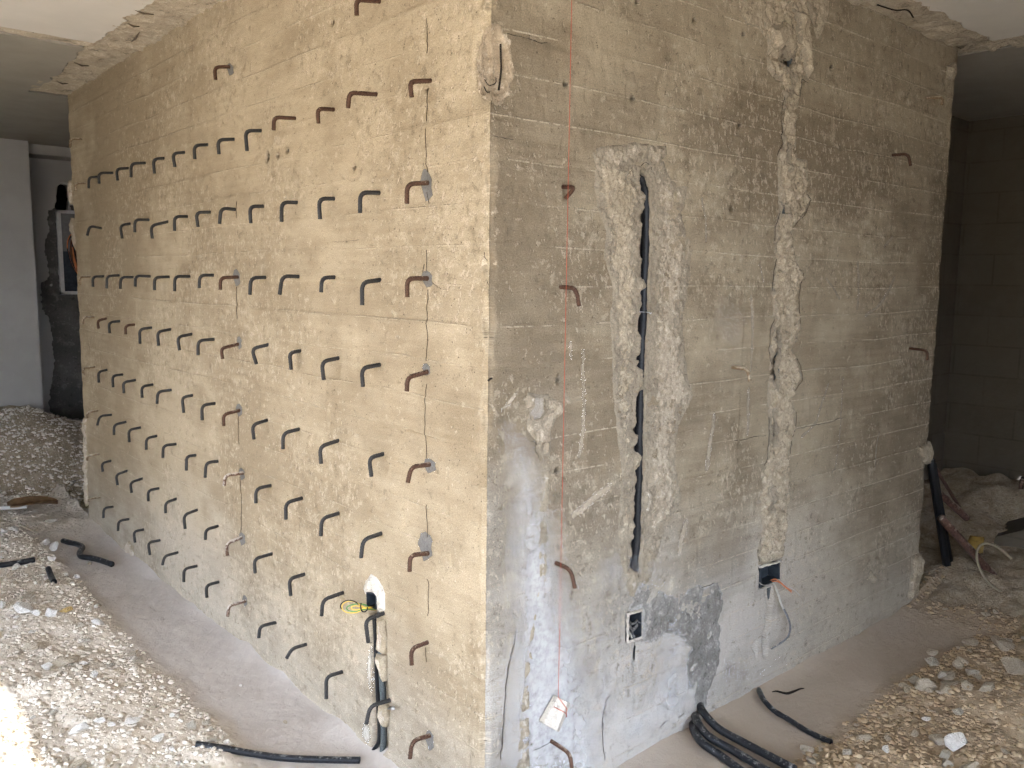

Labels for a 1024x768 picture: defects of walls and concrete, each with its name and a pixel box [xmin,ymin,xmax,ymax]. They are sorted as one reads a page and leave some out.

spalling [0,0,226,95]
spalling [476,23,515,106]
spalling [847,0,1024,55]
crack [422,250,447,358]
spalling [756,0,829,565]
spalling [592,142,692,597]